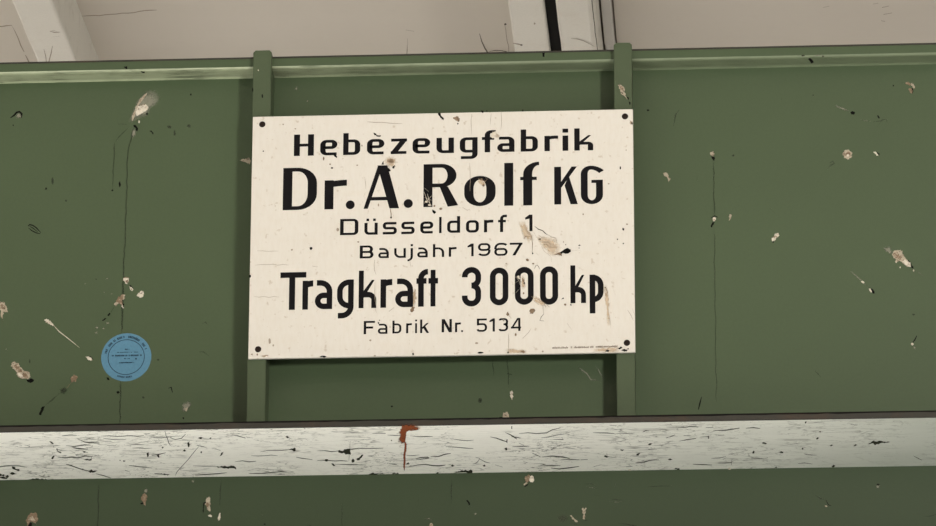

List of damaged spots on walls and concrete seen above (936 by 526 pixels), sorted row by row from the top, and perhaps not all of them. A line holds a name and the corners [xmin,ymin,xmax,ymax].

peeling [132,93,148,123]
peeling [885,248,914,272]
peeling [11,360,34,383]
rust [398,424,419,470]